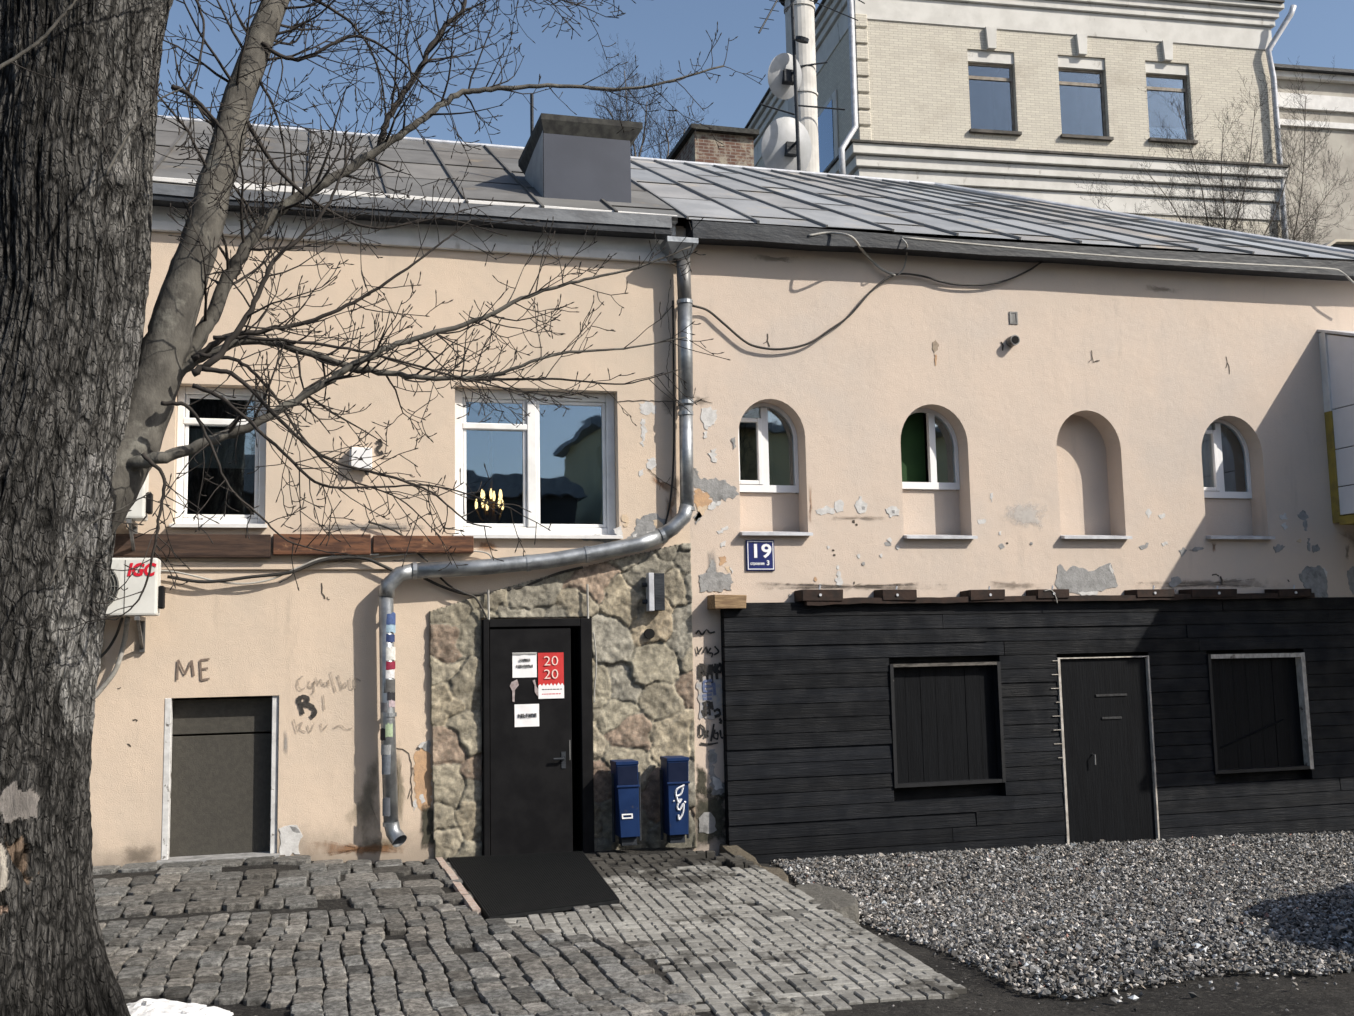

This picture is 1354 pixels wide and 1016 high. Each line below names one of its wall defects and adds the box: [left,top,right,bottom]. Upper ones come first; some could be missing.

spalling [693,406,739,524]
peeling [699,526,733,592]
peeling [1055,563,1118,595]
peeling [1273,510,1328,597]
leakage [358,783,374,821]
peeling [413,740,432,811]